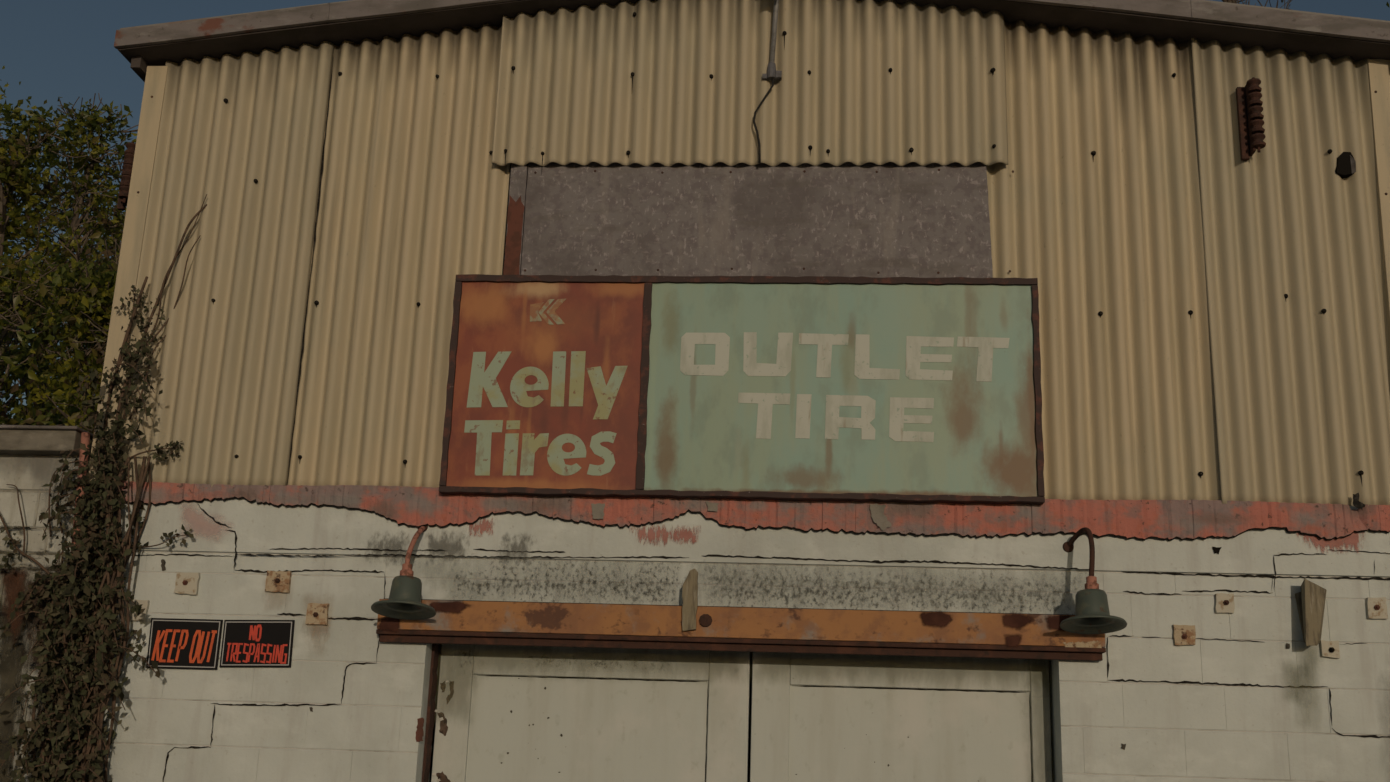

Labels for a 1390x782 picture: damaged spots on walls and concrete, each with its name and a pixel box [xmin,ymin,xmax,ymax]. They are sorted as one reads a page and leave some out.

peeling [638,525,698,545]
crack [1122,549,1390,595]
corrosion [430,601,470,613]
crack [135,503,1089,782]
corrosion [920,611,952,627]
corrosion [1002,613,1070,647]
leakage [0,550,111,782]